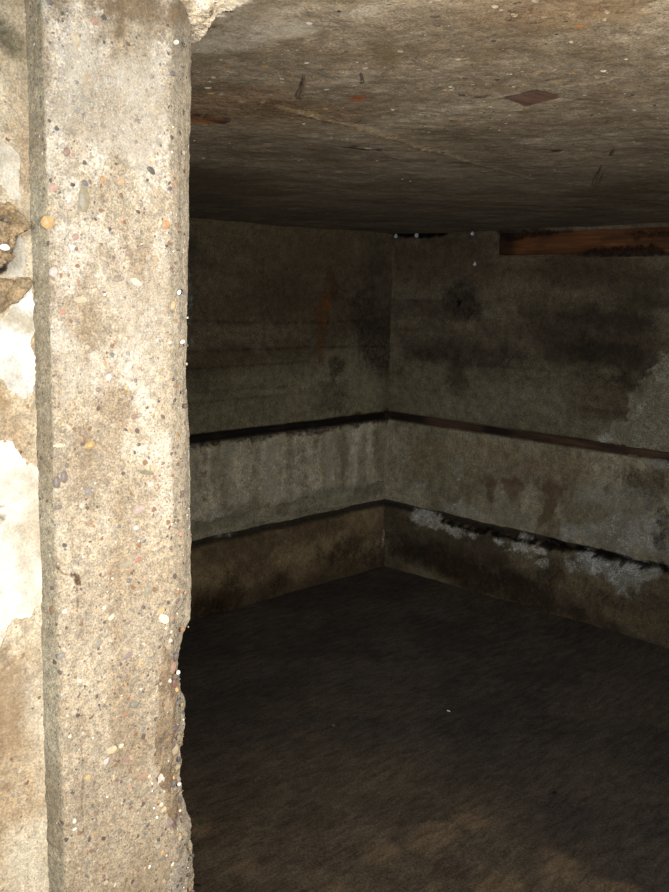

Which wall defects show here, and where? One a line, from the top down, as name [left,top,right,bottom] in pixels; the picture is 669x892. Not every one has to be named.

damp [89,0,190,37]
flaking render [0,136,36,399]
flaking render [0,440,42,646]
damp [412,503,479,538]
damp [557,459,669,602]